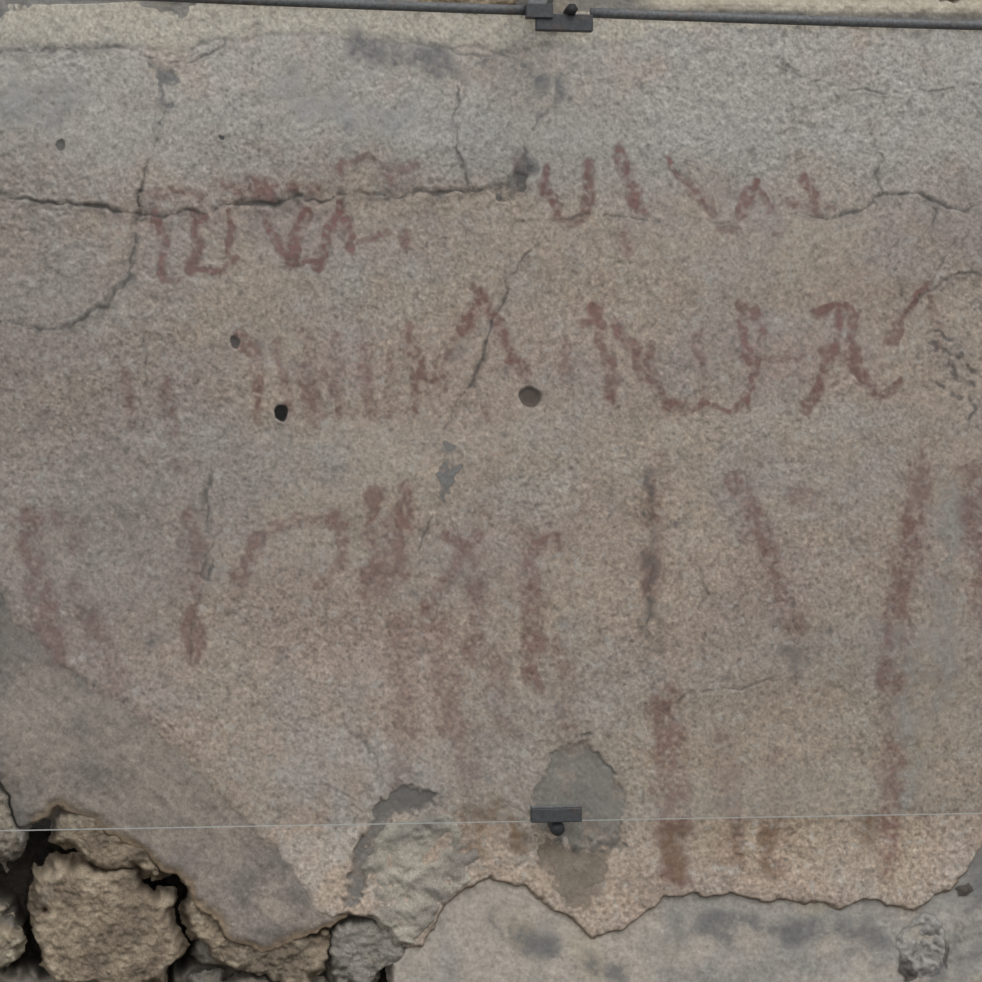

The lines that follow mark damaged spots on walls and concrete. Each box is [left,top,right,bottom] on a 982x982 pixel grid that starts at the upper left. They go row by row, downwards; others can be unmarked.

crack [234,193,347,208]
crack [416,187,492,196]
crack [811,193,973,219]
crack [21,183,168,329]
spalling [343,785,436,907]
peeling [955,884,973,896]
peeling [896,913,949,982]